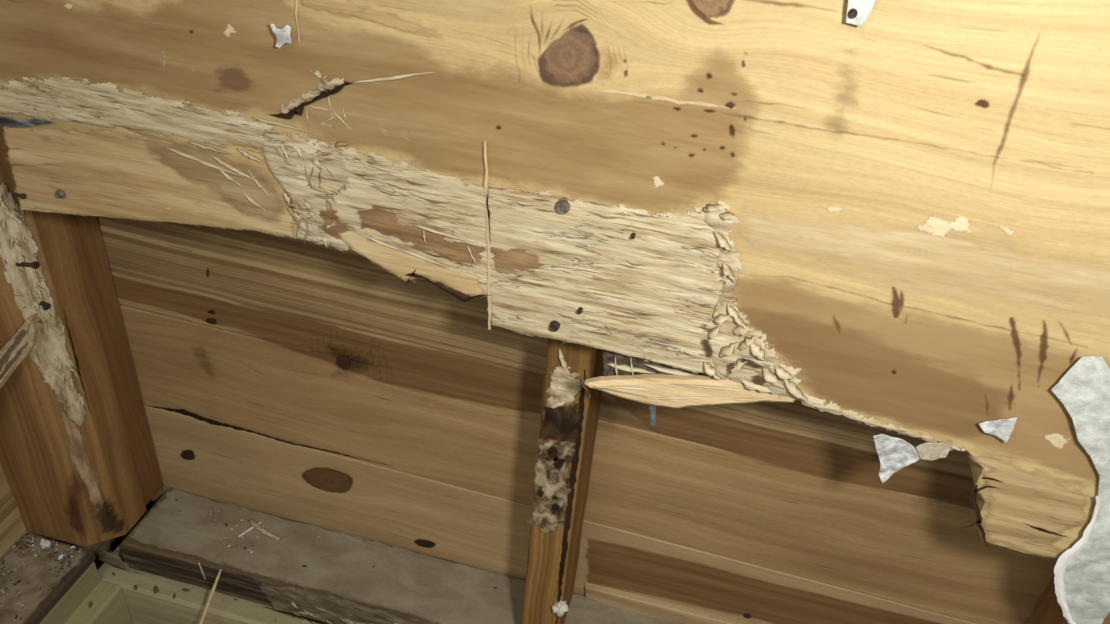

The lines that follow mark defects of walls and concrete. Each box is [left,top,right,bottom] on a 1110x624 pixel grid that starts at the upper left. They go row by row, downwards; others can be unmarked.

crack [268,81,352,119]
peeling [306,96,350,147]
damp [0,0,750,211]
peeling [283,189,335,247]
peeling [703,204,737,220]
crack [405,269,492,302]
peeling [702,303,808,404]
crack [145,405,394,467]
damp [112,277,581,534]
damp [616,397,975,505]
crack [962,477,1003,547]
damp [587,541,938,624]